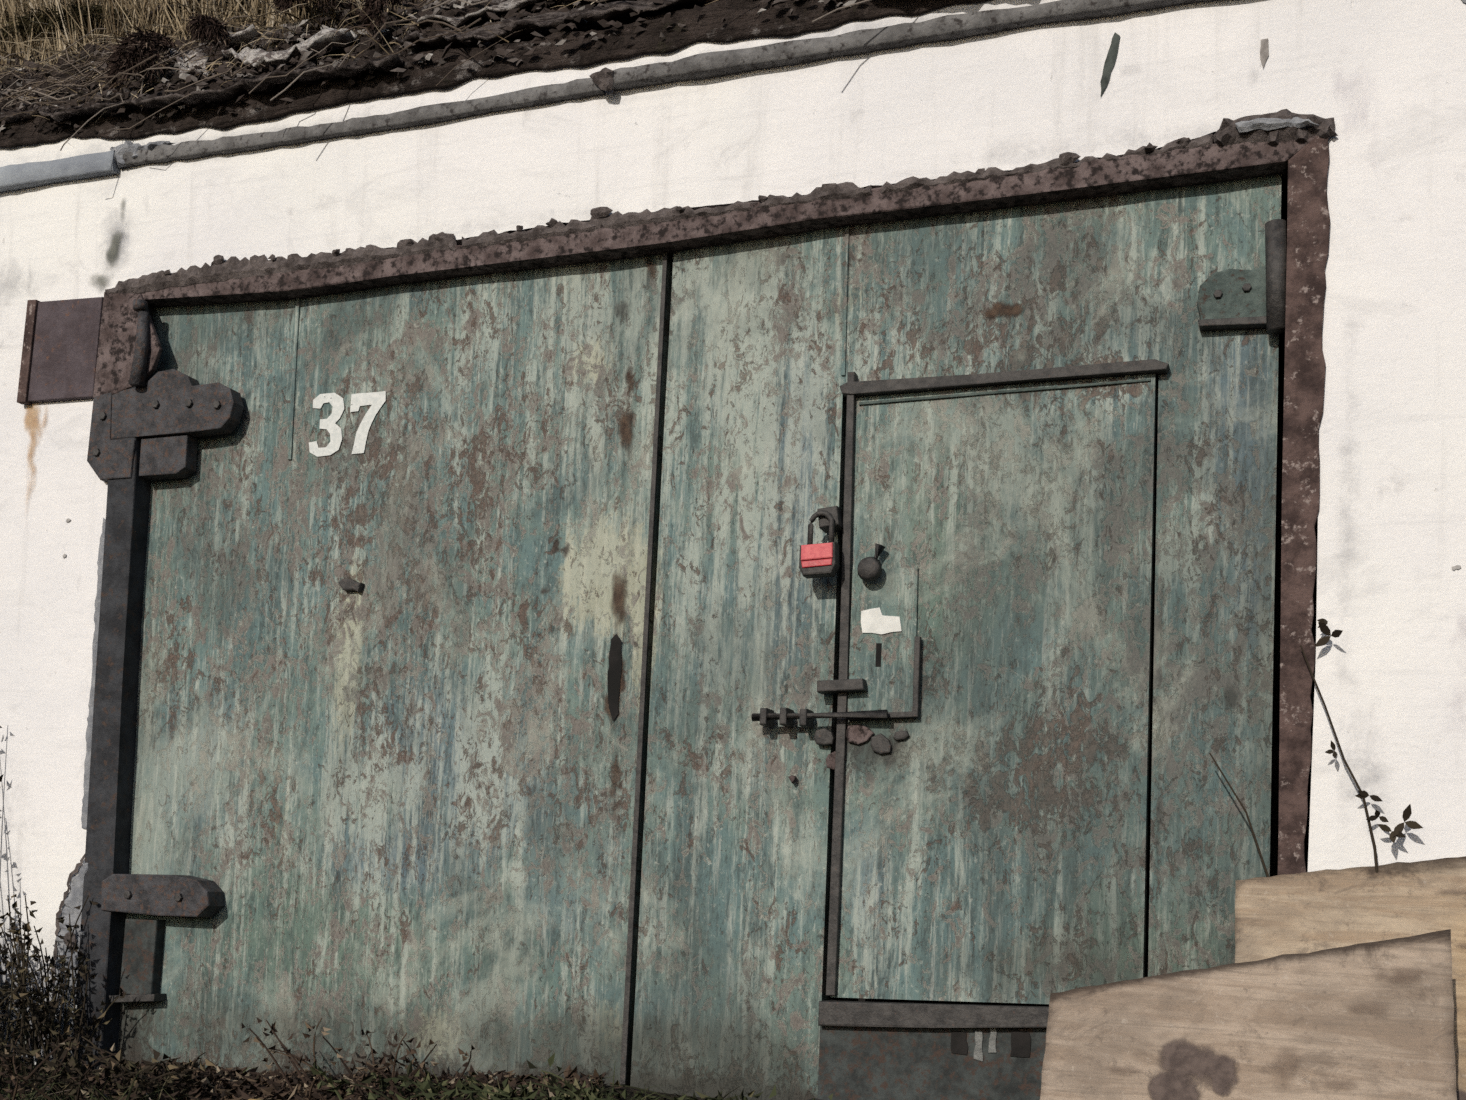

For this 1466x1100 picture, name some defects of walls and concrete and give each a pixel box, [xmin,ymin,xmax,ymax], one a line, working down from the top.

rust [985,302,1022,318]
rust [25,405,38,459]
rust [619,411,632,447]
rust [604,576,626,721]
spalling [10,854,88,1066]